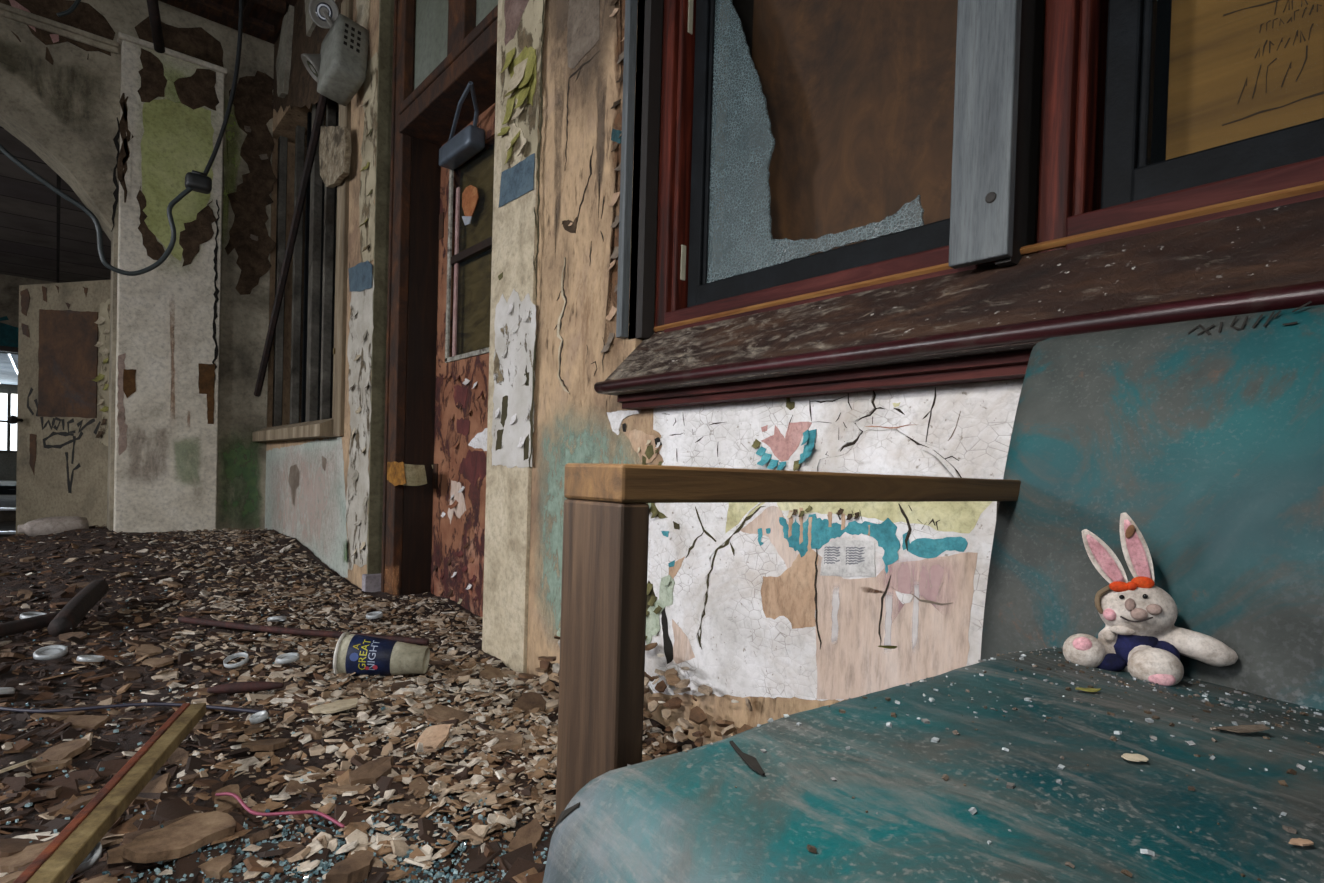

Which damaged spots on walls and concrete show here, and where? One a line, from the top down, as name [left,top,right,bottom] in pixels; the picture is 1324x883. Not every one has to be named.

peeling [334,0,371,30]
crack [111,93,134,232]
peeling [136,0,330,295]
peeling [76,52,559,880]
crack [662,413,724,458]
peeling [607,379,1024,479]
crack [788,387,962,478]
crack [646,502,765,664]
crack [814,548,822,649]
peeling [645,501,997,701]
crack [878,503,951,646]
peeling [642,719,669,762]